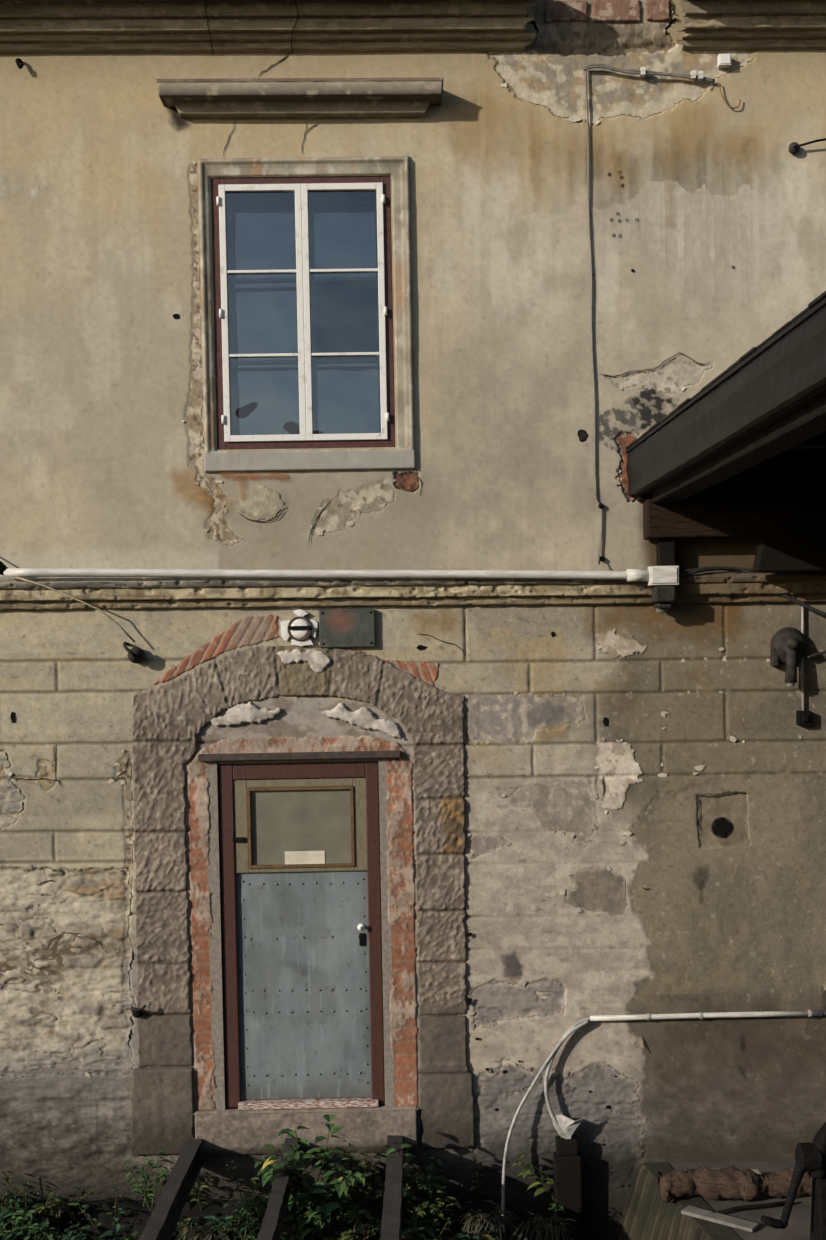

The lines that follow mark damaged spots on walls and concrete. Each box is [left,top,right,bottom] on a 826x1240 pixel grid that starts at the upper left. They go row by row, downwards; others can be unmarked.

crack [258,1,299,77]
peeling [486,0,756,125]
leakage [621,181,723,293]
peeling [600,352,712,393]
peeling [308,474,422,543]
peeling [595,628,646,658]
peeling [500,738,667,848]
peeling [467,833,511,858]
spalling [0,743,135,1079]
peeling [559,866,628,915]
spalling [467,952,564,1040]
spalling [473,1059,646,1195]